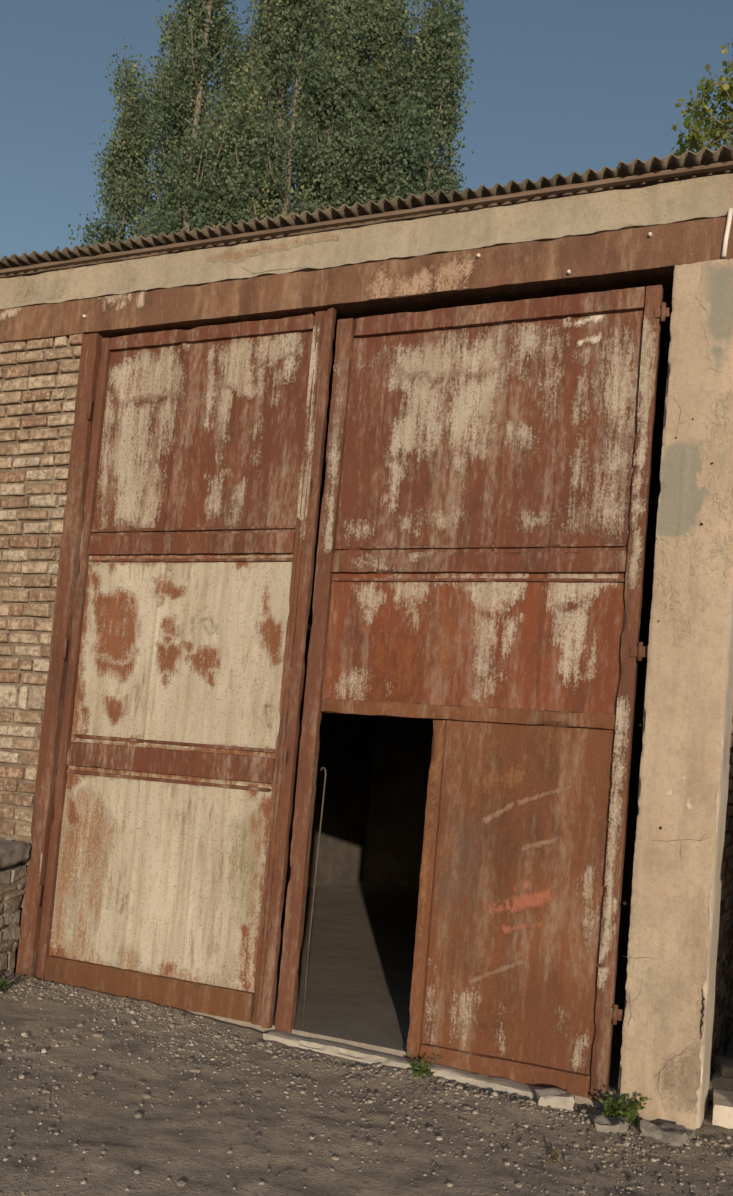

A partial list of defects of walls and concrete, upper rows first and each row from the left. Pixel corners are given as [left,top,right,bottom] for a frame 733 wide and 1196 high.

peeling [96,312,658,704]
water stain [658,389,733,646]
rust [71,554,293,758]
rust [49,765,272,1002]
rust [417,726,444,938]